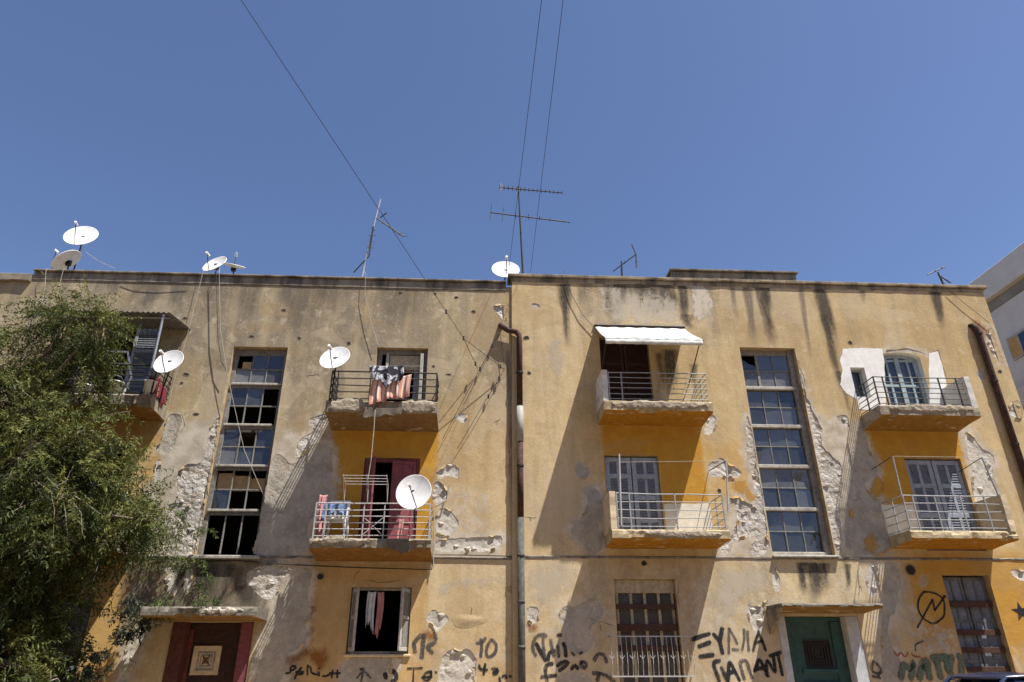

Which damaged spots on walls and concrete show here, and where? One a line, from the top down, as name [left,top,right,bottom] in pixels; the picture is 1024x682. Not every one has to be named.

water stain [560,285,569,330]
water stain [641,284,690,324]
water stain [744,288,773,331]
water stain [815,289,838,368]
water stain [933,287,942,317]
spalling [161,417,220,597]
spalling [246,398,371,682]
spalling [432,463,502,553]
spalling [644,416,769,557]
water stain [798,563,826,591]
spalling [800,372,917,682]
spalling [965,432,997,502]